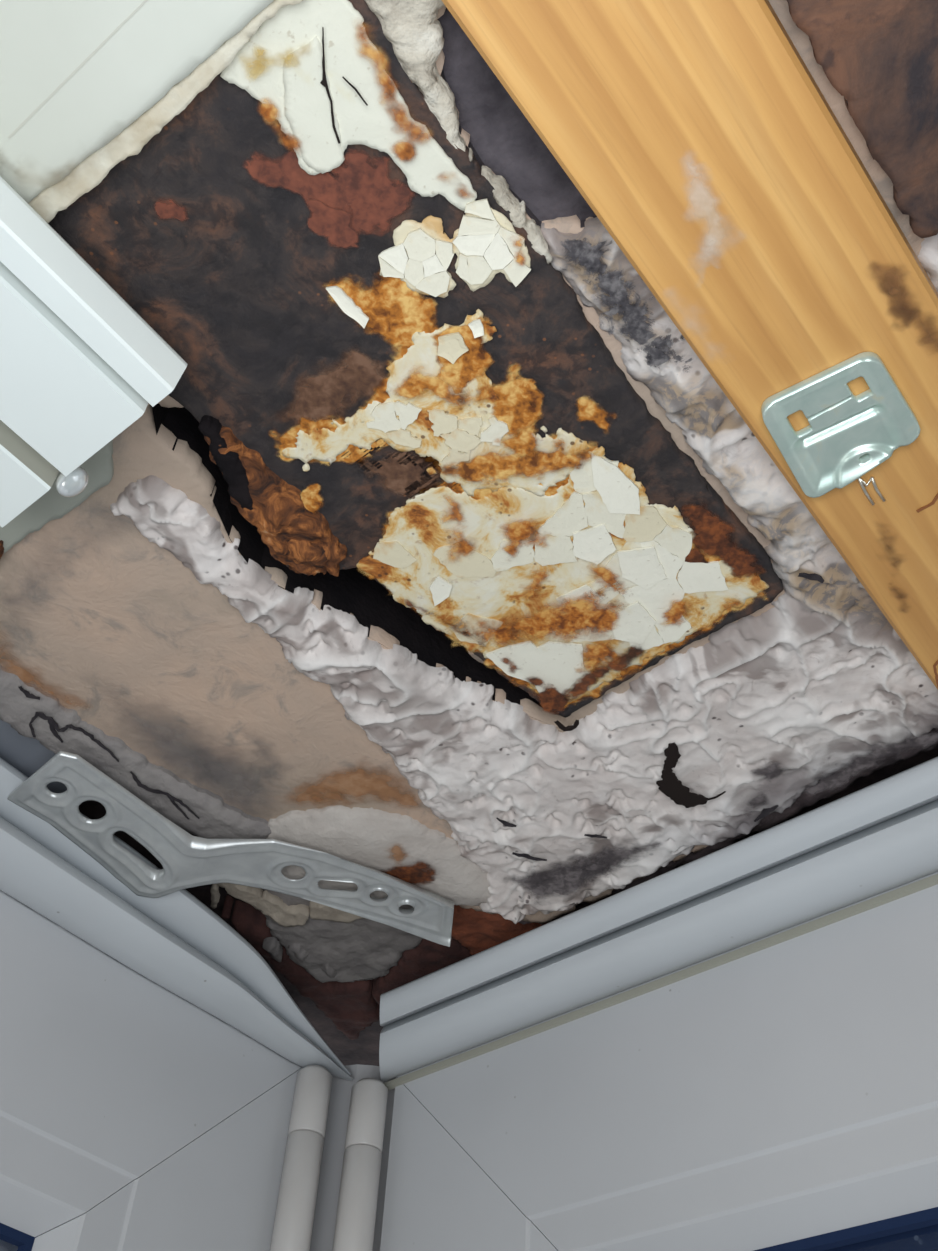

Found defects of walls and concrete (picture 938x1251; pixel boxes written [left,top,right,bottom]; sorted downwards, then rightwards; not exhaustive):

corrosion [245,26,430,248]
crack [320,27,368,144]
peeling [220,0,553,298]
peeling [326,286,369,328]
leakage [561,238,692,372]
leakage [875,266,938,347]
corrosion [271,275,597,560]
corrosion [198,415,347,577]
peeling [281,309,769,702]
corrosion [682,505,765,577]
corrosion [402,567,767,714]
crack [18,686,199,819]